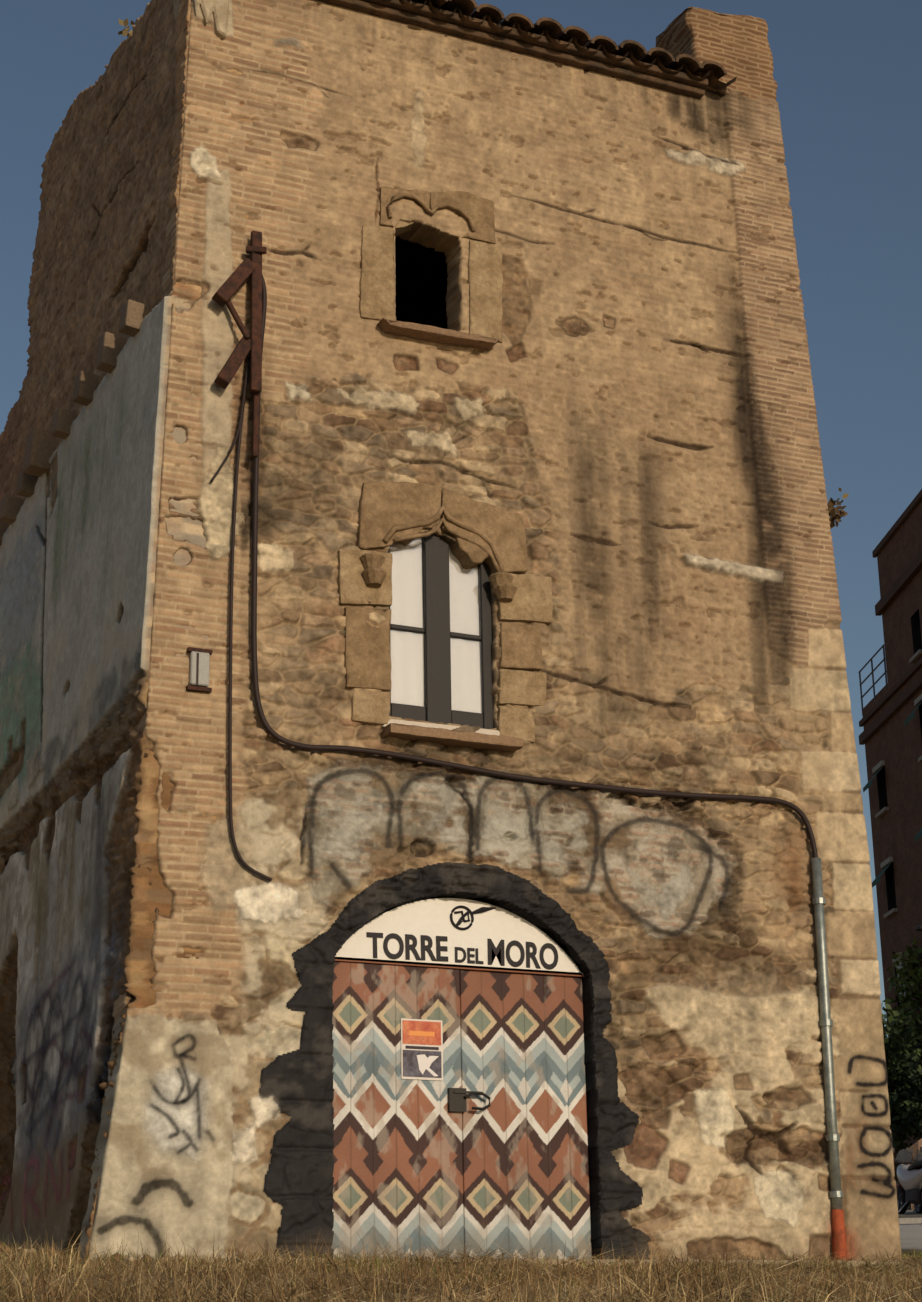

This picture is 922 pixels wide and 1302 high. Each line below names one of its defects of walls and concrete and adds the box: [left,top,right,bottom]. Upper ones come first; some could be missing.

crack [514,196,722,251]
spalling [0,710,149,869]